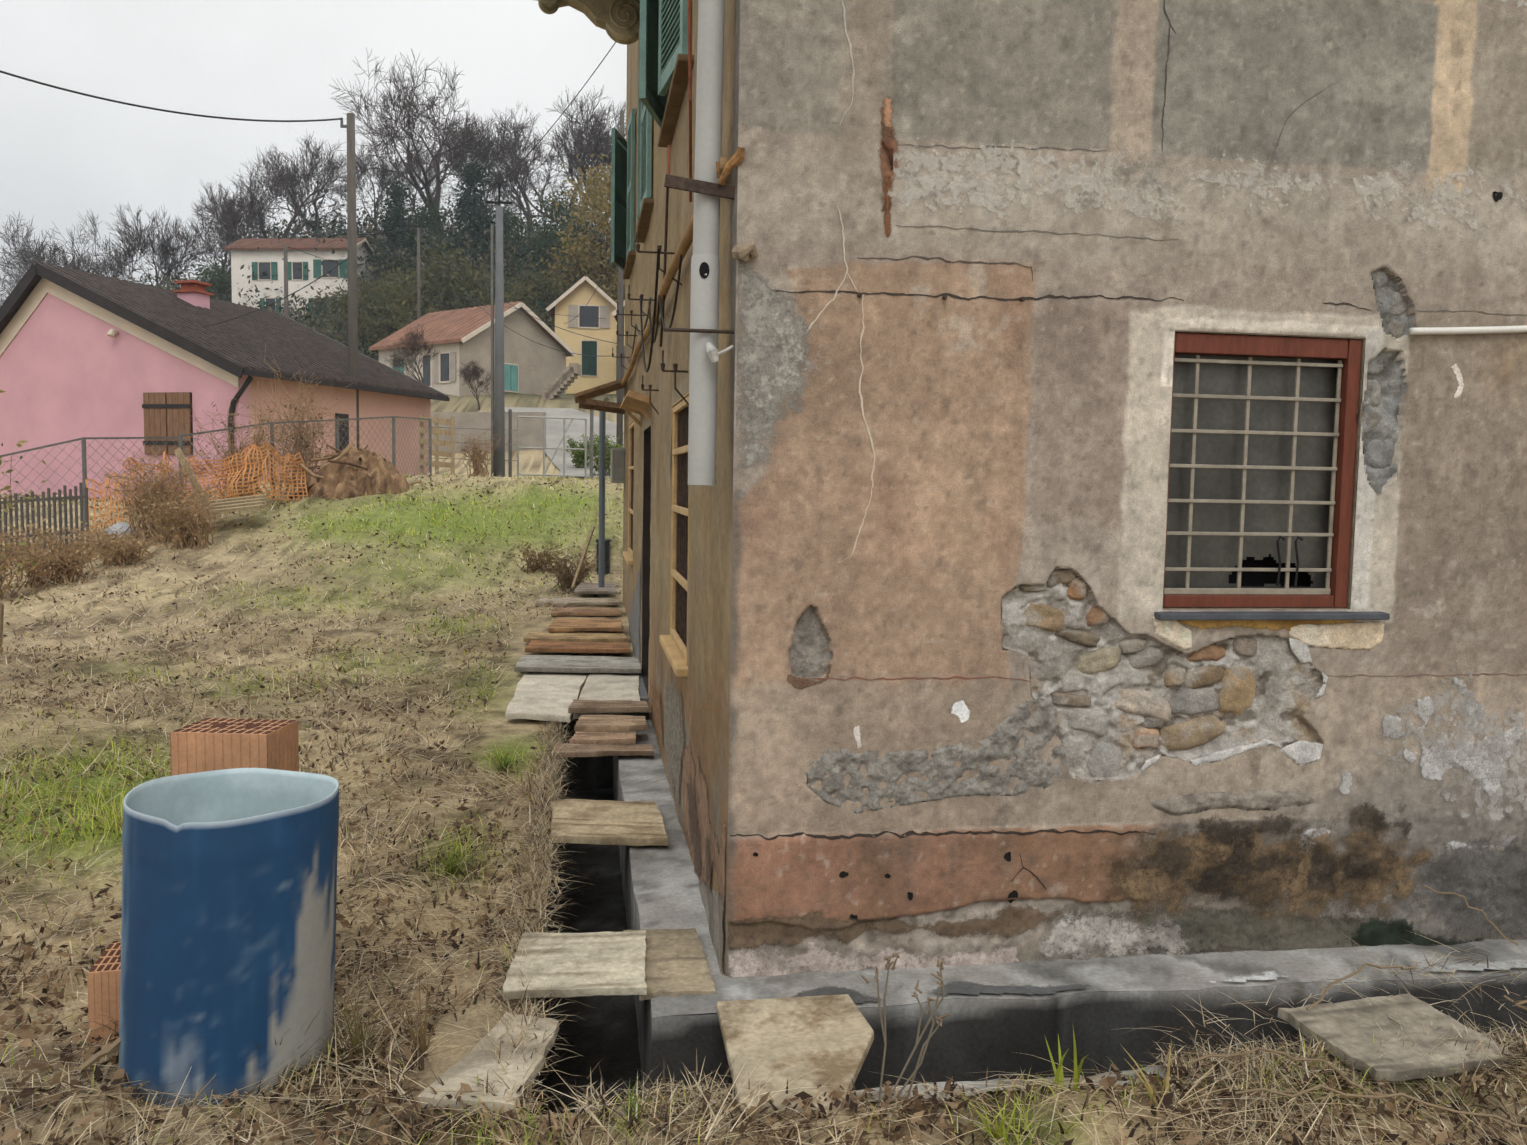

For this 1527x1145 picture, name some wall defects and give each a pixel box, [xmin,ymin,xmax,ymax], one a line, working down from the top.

corrosion [880,98,898,237]
crack [1323,302,1371,311]
crack [772,207,1184,563]
flaking render [1364,355,1391,469]
flaking render [789,605,834,681]
flaking render [1019,569,1328,775]
peeling [853,725,862,749]
peeling [1372,671,1527,850]
damp [728,803,1527,955]
damp [1210,971,1288,983]
damp [1426,959,1527,972]